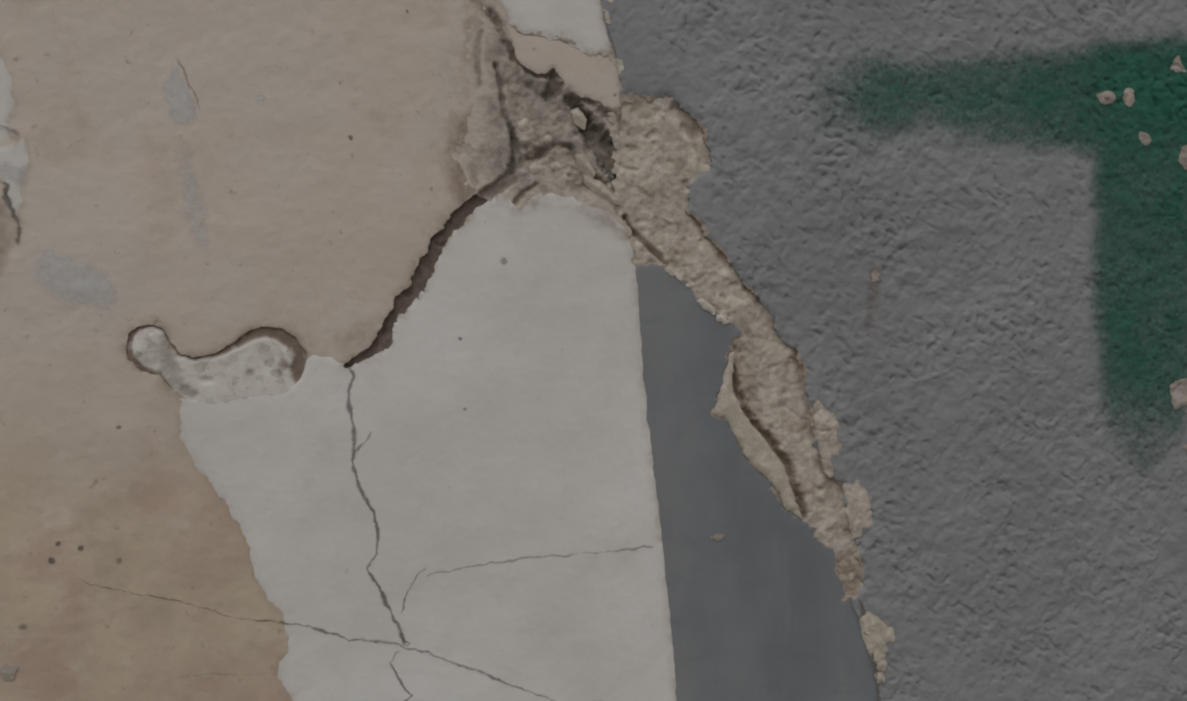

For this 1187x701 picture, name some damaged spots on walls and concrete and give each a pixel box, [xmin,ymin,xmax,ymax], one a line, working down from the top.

peeling [1170,56,1187,73]
peeling [1096,88,1135,107]
peeling [1139,131,1151,146]
peeling [1178,145,1187,170]
peeling [0,0,873,701]
peeling [1169,378,1187,414]
crack [260,194,488,701]
spalling [859,612,895,684]